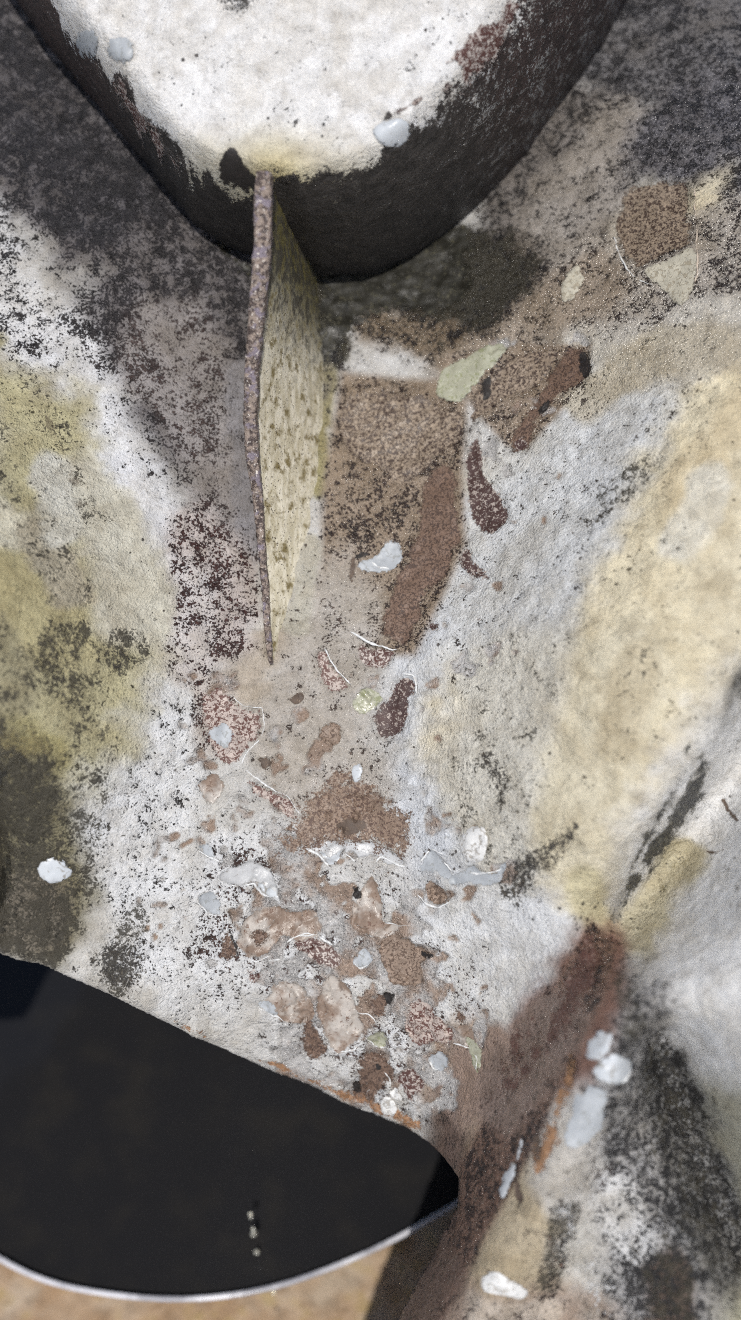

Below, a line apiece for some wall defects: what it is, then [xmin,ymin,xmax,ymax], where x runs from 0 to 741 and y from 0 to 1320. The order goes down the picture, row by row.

damp [317,218,476,375]
peeling [338,349,558,534]
peeling [198,687,299,818]
spalling [289,692,304,704]
spalling [319,723,341,746]
damp [0,847,13,909]
peeling [420,826,501,875]
damp [89,921,151,999]
peeling [198,856,482,1116]
corrosion [500,928,605,1175]
damp [545,1174,630,1317]